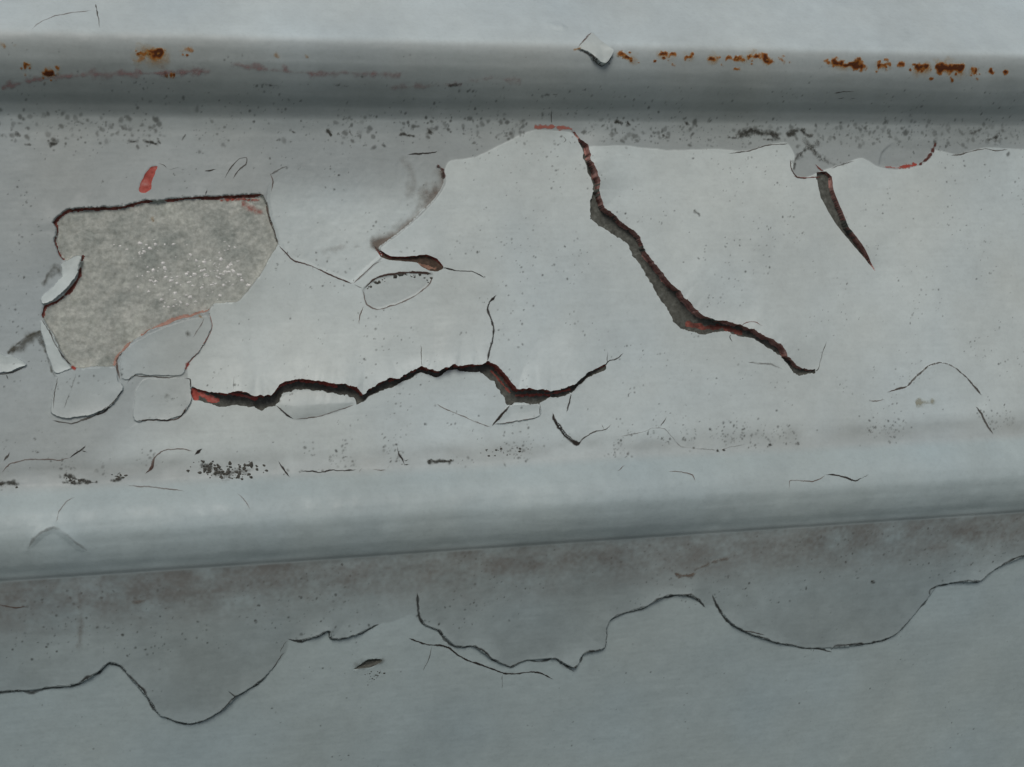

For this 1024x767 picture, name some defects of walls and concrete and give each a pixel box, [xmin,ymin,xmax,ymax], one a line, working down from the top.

rust [20,62,59,81]
rust [135,48,164,61]
rust [708,53,790,70]
rust [824,57,1008,82]
peeling [879,137,936,169]
crack [551,110,826,376]
crack [735,143,875,271]
peeling [41,151,445,424]
crack [191,250,622,446]
crack [875,362,993,433]
peeling [416,594,896,671]
peeling [0,624,379,725]